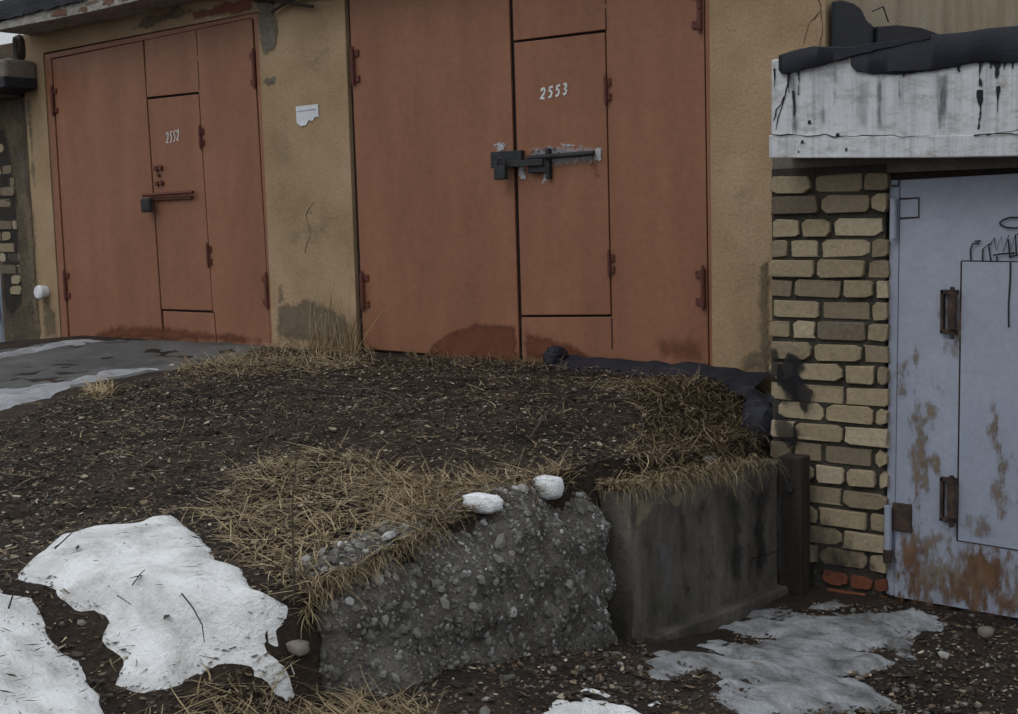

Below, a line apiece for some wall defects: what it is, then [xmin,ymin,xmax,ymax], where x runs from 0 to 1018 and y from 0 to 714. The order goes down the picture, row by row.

water stain [773,68,800,128]
water stain [938,77,946,121]
water stain [976,62,1014,130]
peeling [0,130,33,342]
water stain [277,289,350,347]
rust [425,325,587,361]
rust [909,404,940,508]
rust [889,518,1018,614]